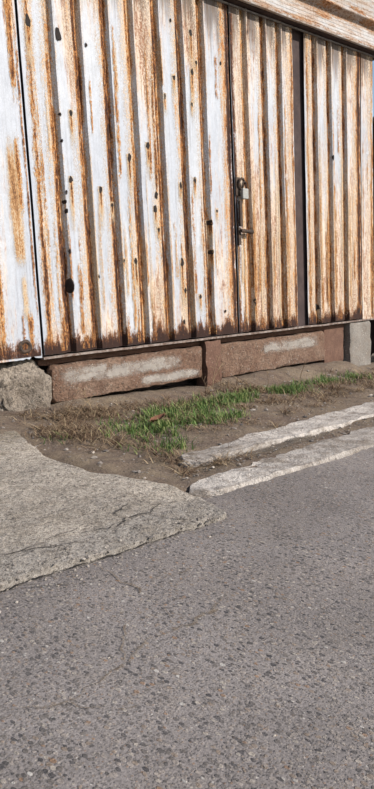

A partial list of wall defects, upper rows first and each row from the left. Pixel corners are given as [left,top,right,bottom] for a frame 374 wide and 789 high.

rust [0,0,374,360]
crack [0,501,192,596]
crack [0,602,219,720]